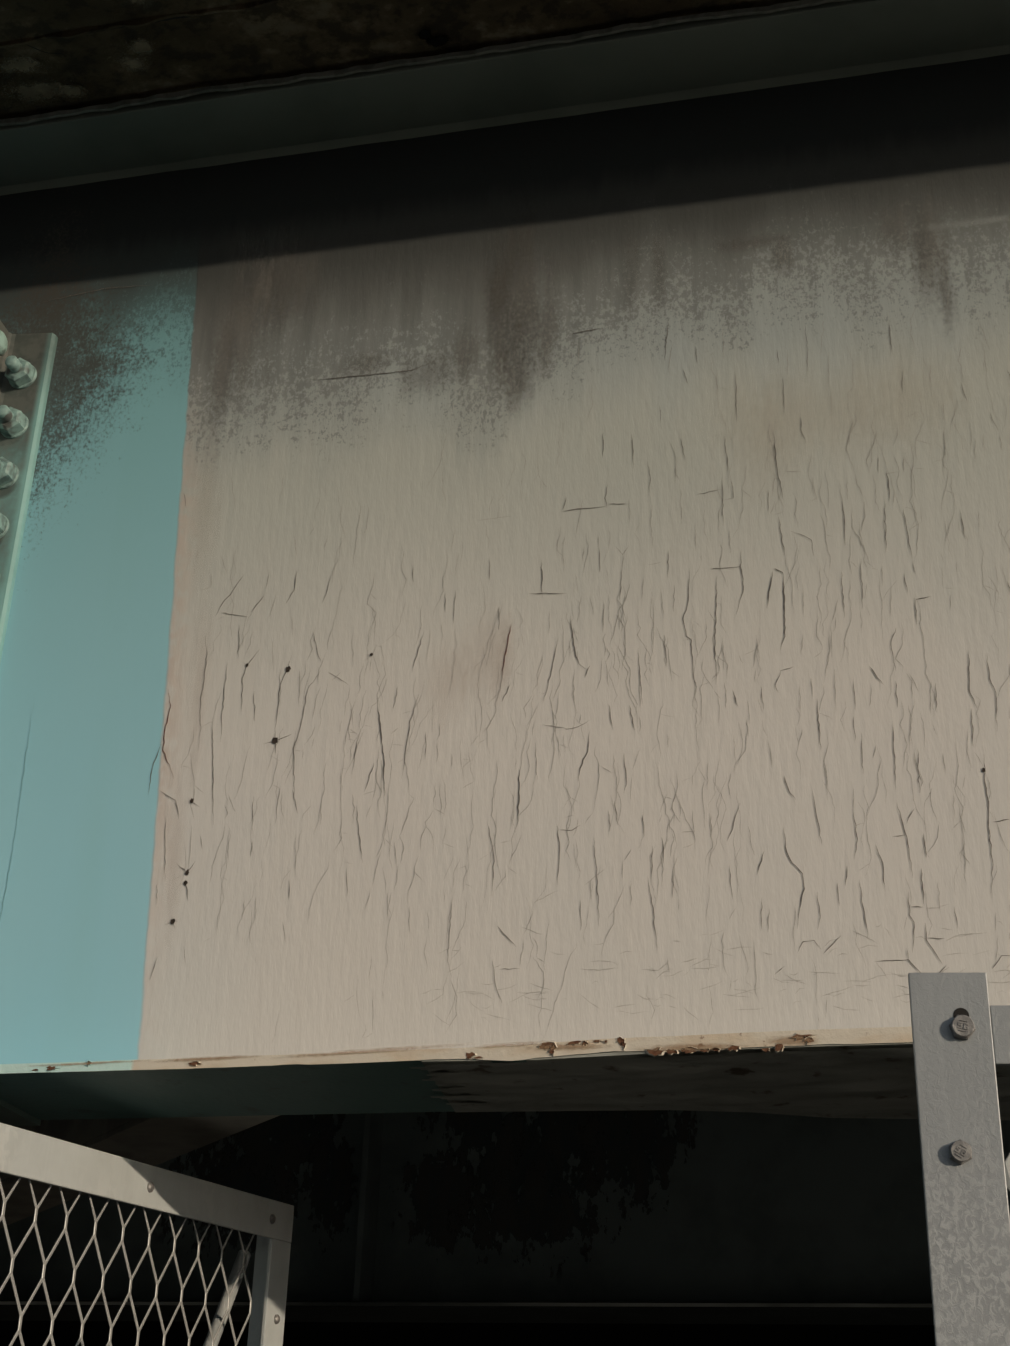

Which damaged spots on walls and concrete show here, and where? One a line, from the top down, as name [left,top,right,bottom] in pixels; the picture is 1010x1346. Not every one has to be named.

crack [149,285,1010,1041]